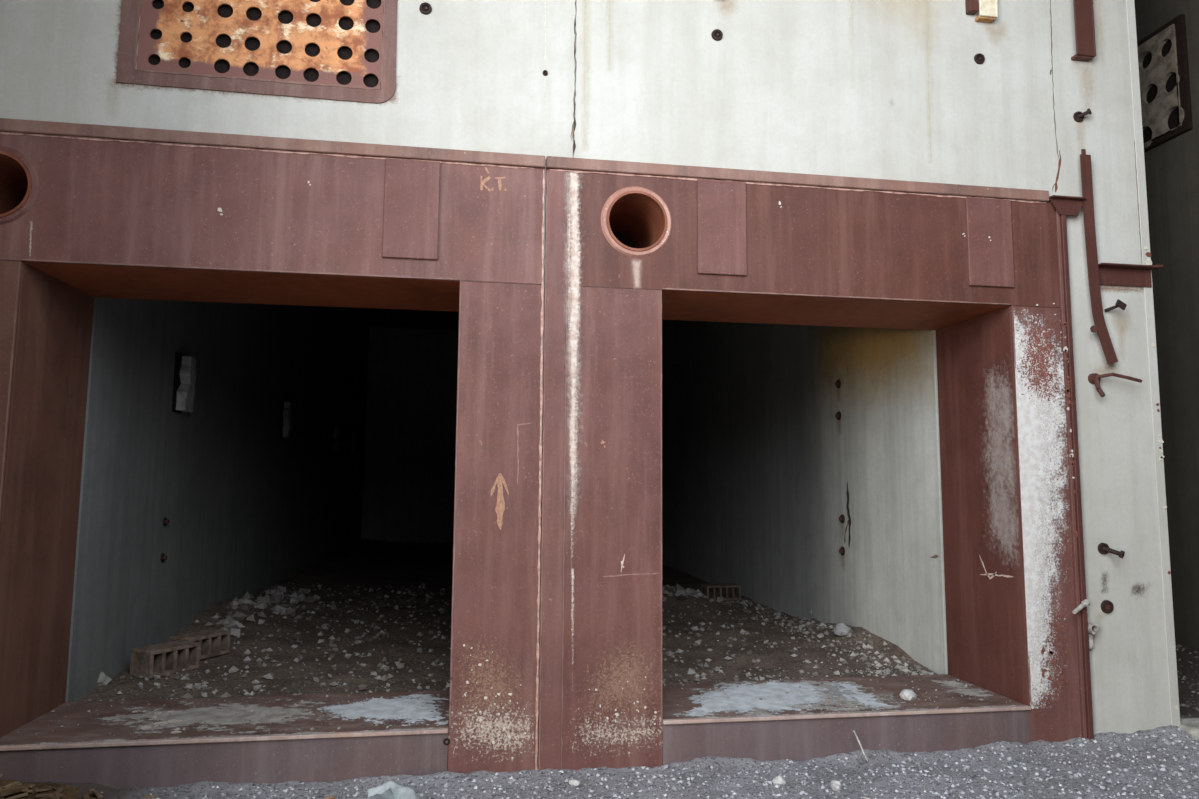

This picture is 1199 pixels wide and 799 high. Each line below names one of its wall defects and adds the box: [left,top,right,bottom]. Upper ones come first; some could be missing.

leakage [568,173,580,630]